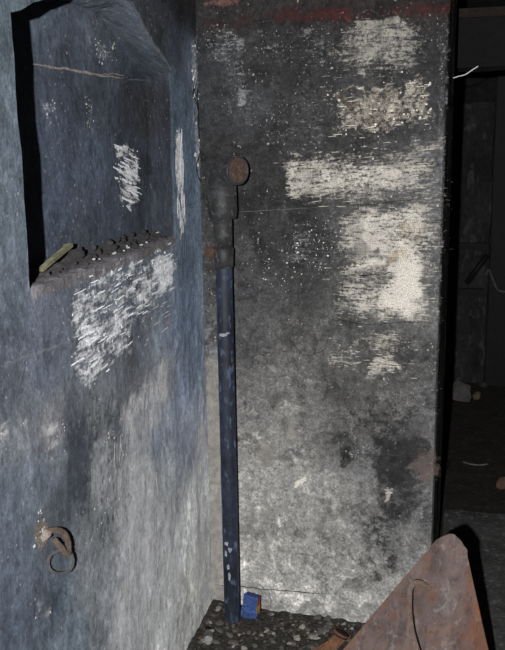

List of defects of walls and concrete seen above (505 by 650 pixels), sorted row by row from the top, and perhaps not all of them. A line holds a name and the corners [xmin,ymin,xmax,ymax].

crack [33,64,123,78]
leakage [356,431,431,573]